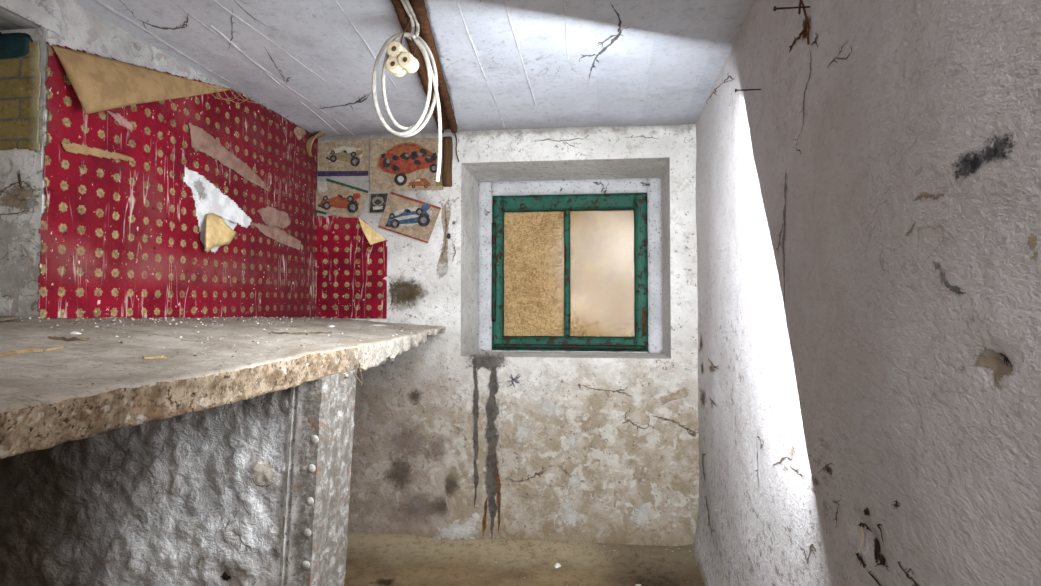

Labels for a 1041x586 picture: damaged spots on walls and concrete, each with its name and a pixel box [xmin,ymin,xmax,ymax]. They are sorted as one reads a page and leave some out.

crack [579,4,629,78]
rust [789,16,811,52]
peeling [52,45,235,114]
spalling [0,170,39,243]
spalling [183,165,252,254]
crack [776,32,852,320]
leakage [389,277,426,306]
spalling [961,346,1013,389]
leakage [469,352,504,539]